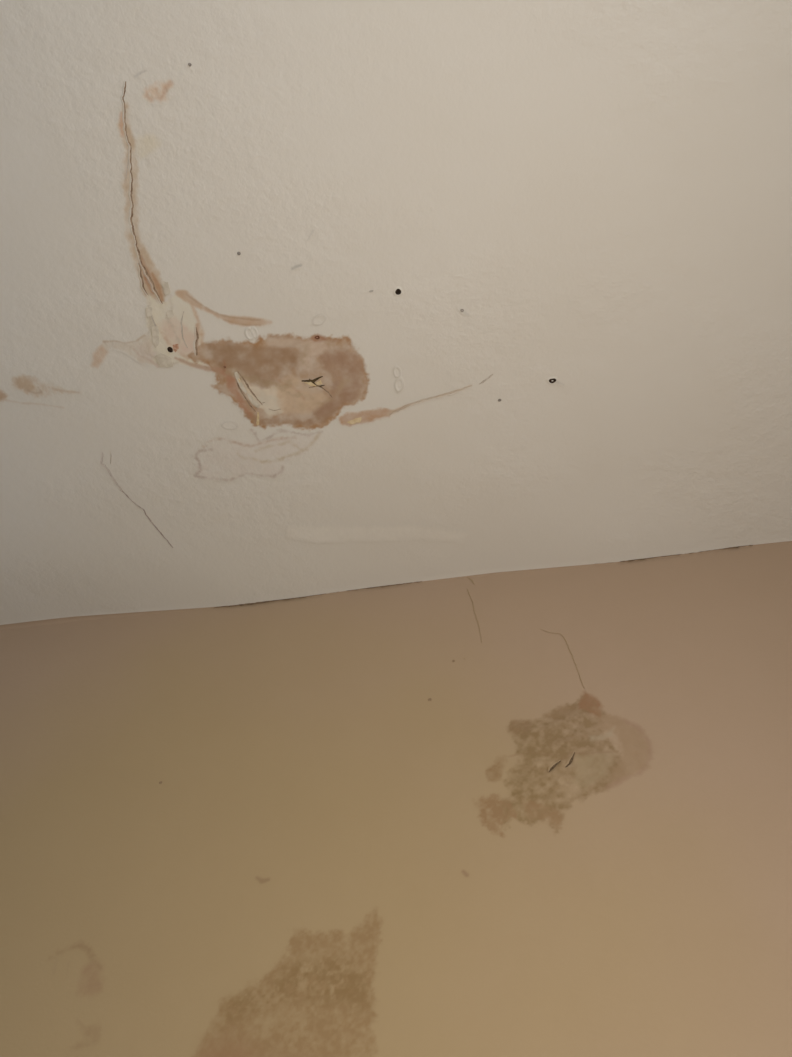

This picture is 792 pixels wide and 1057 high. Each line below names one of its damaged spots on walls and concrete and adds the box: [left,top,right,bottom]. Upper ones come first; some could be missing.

crack [115,81,166,304]
damp [0,372,83,410]
peeling [140,280,206,369]
damp [173,288,371,483]
crack [99,450,173,548]
crack [214,581,422,608]
damp [470,689,656,839]
damp [187,905,385,1057]